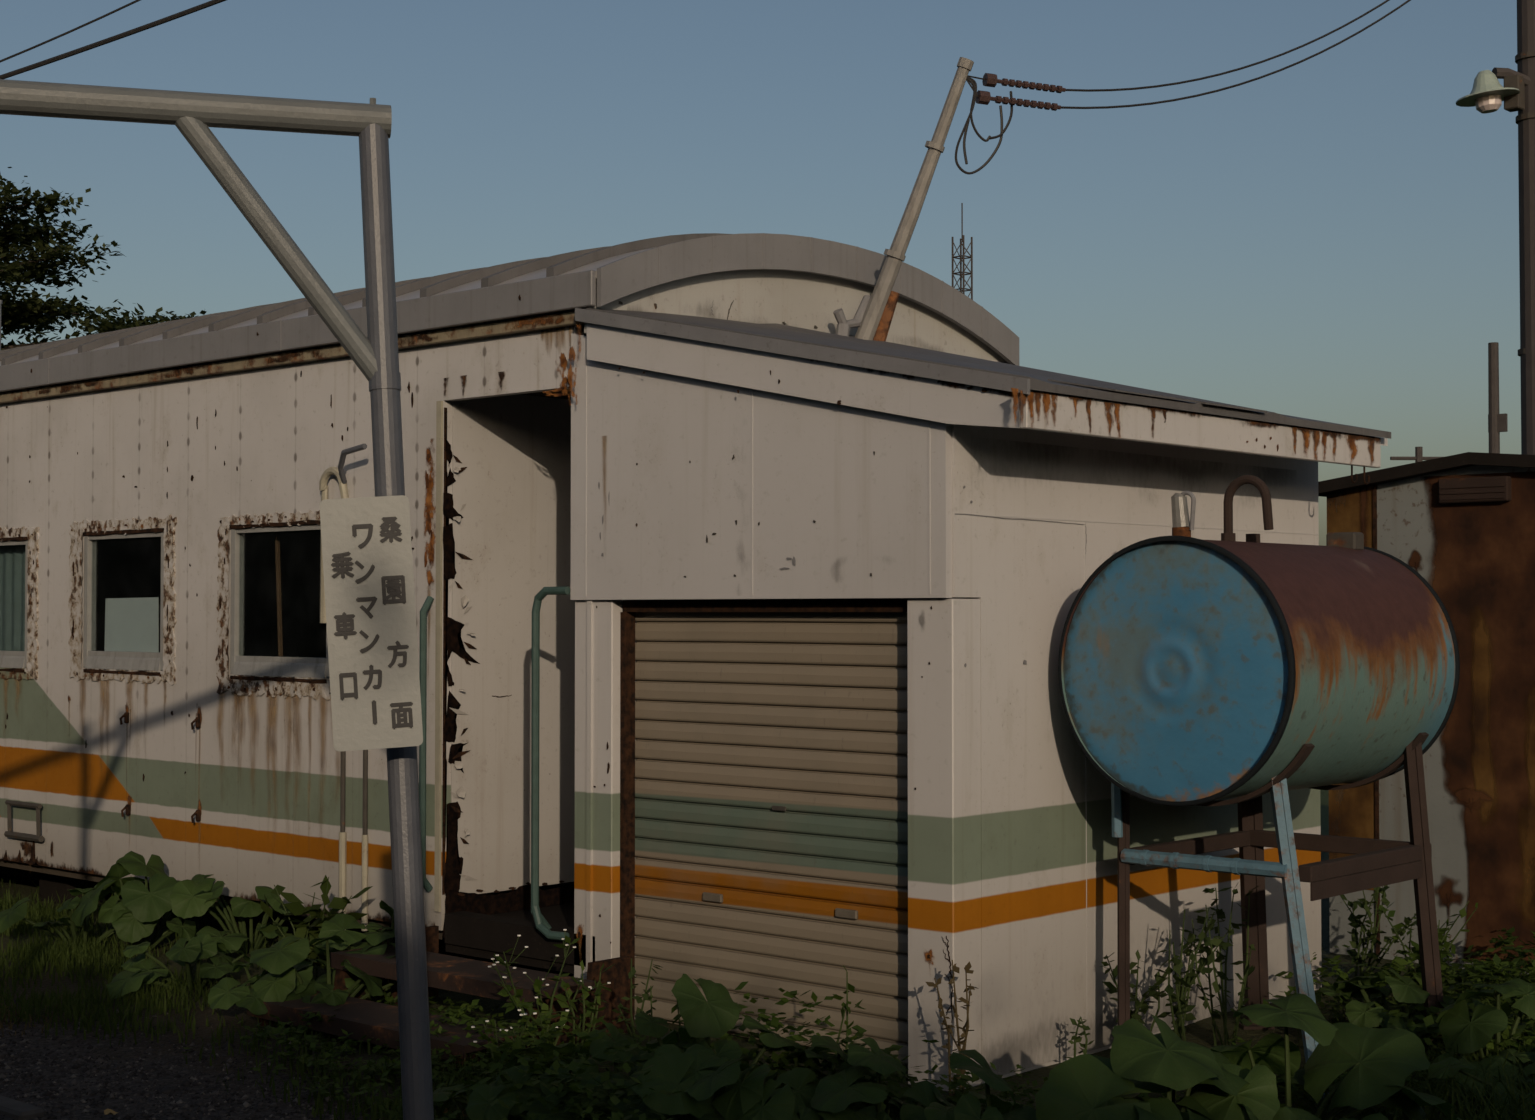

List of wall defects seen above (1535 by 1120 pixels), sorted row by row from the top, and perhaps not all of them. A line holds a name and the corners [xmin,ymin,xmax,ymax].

rust [514,315,581,405]
rust [1011,388,1127,435]
rust [1147,406,1204,437]
rust [1247,420,1381,463]
rust [1327,485,1373,548]
peeling [0,526,40,681]
peeling [68,492,191,685]
peeling [215,510,331,700]
rust [68,679,325,758]
rust [1409,471,1535,968]
rust [0,841,102,876]
rust [1329,782,1375,860]